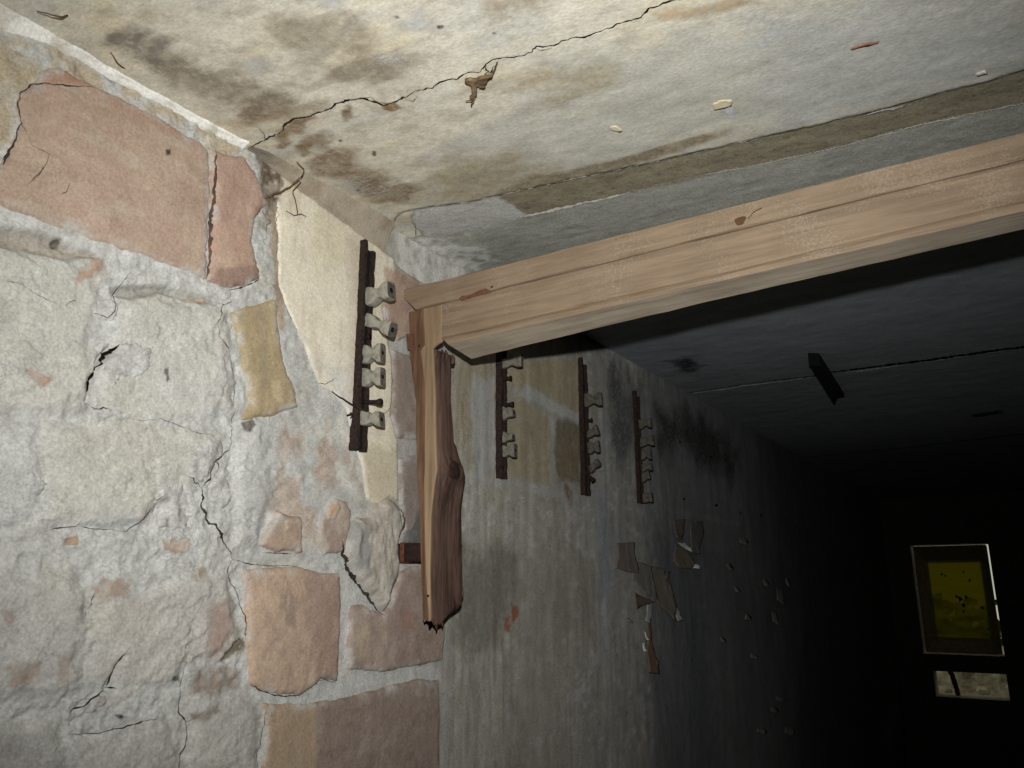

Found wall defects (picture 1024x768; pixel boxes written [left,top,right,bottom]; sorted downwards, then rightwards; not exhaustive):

crack [3,82,92,185]
damp [108,29,413,202]
damp [270,17,409,80]
crack [252,0,674,147]
damp [501,135,712,194]
flaking render [395,69,1024,273]
peeling [92,342,153,424]
crack [68,204,295,766]
peeling [616,519,701,674]